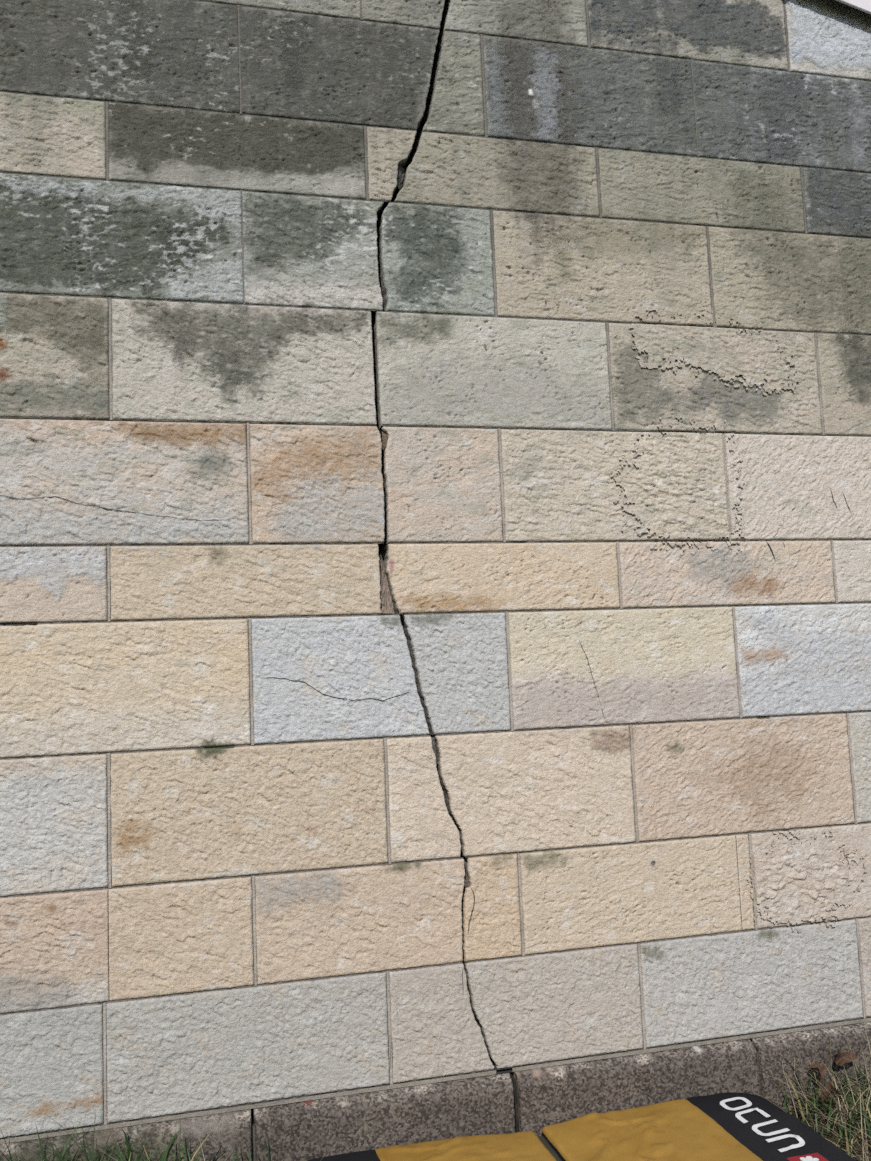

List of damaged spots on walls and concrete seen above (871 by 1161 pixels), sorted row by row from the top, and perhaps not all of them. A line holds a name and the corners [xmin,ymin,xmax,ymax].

damp [589,0,871,68]
damp [0,0,425,173]
damp [140,188,241,224]
damp [168,261,246,302]
crack [263,0,519,1133]